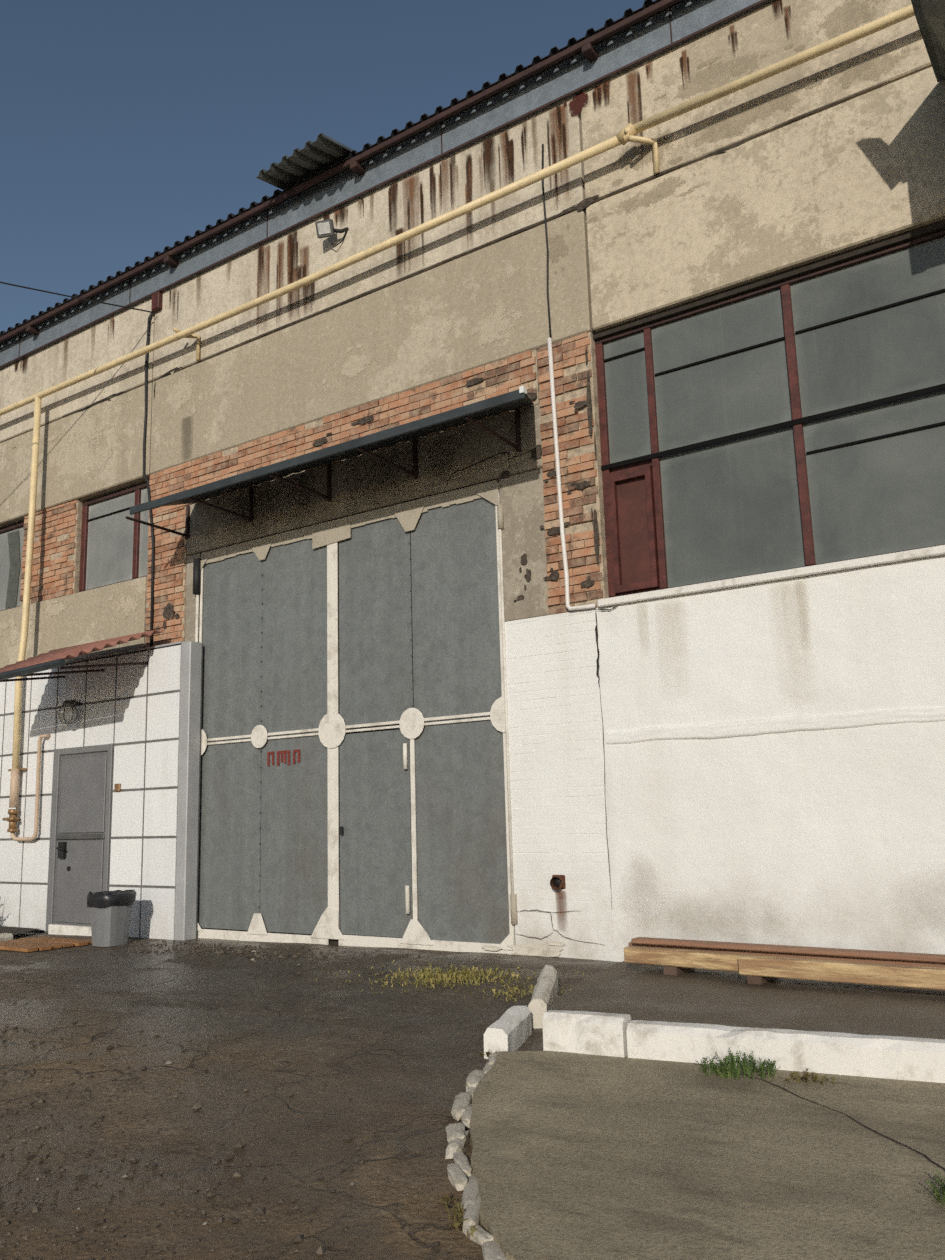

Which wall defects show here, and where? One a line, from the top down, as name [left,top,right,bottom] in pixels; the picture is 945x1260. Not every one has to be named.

corrosion [593,81,609,107]
corrosion [627,61,651,135]
corrosion [680,50,689,83]
corrosion [324,194,373,225]
corrosion [388,105,566,263]
corrosion [257,231,315,300]
spalling [163,603,179,628]
crack [695,1063,945,1170]